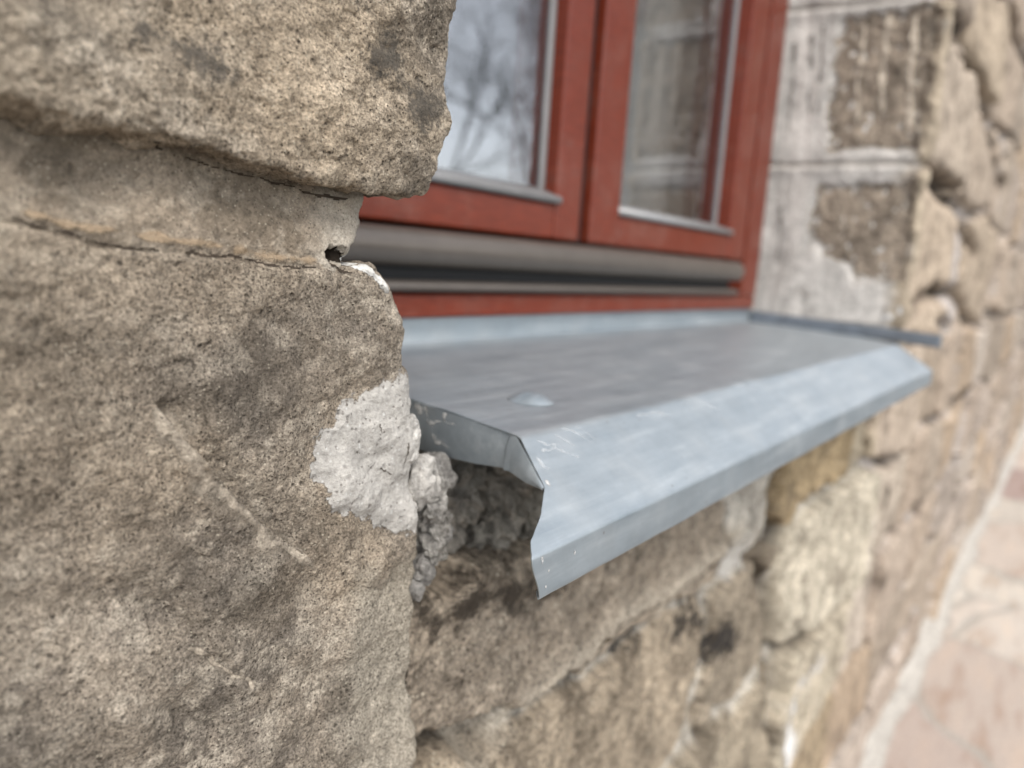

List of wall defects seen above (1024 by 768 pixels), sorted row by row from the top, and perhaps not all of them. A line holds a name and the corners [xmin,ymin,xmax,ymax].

crack [153,141,348,201]
crack [12,218,352,274]
spalling [409,449,550,602]